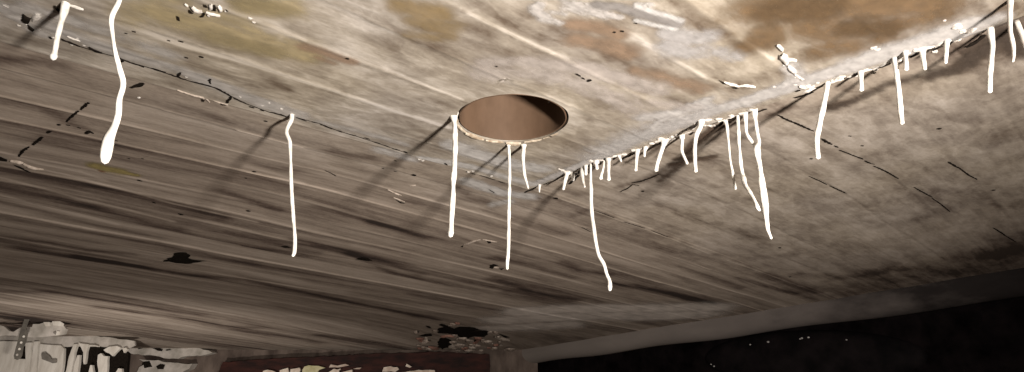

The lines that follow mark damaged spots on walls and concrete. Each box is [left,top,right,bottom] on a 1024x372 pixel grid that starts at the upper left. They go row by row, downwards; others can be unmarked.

crack [18,103,117,157]
crack [49,36,408,153]
water stain [0,0,1024,205]
crack [472,117,734,193]
crack [759,35,986,212]
flaking render [121,348,217,372]
spalling [413,324,510,352]